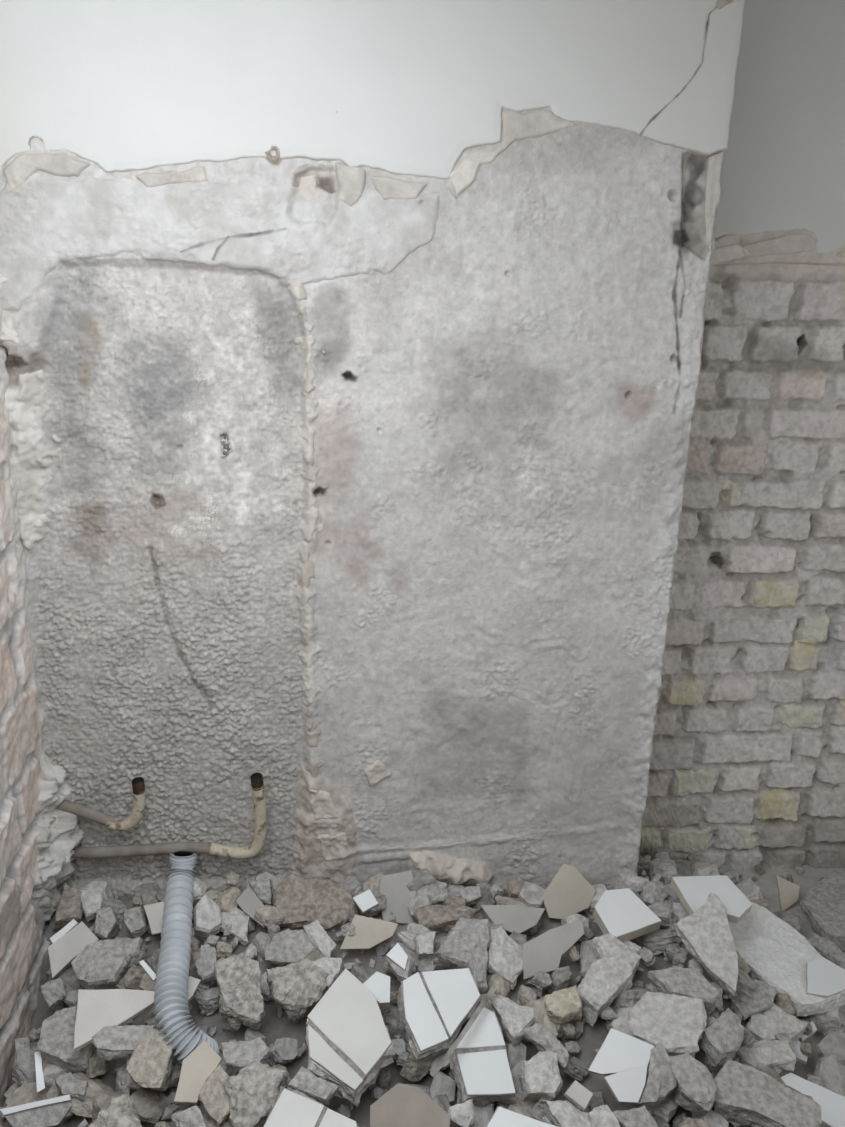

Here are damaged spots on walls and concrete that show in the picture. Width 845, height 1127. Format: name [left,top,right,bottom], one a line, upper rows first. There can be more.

crack [641,59,703,134]
spalling [0,110,577,312]
peeling [682,151,845,266]
spalling [750,577,799,607]
spalling [788,613,830,673]
spalling [662,675,705,706]
spalling [290,765,358,884]
spalling [639,826,711,853]
spalling [734,788,798,849]
spalling [340,870,416,950]
spalling [670,875,752,923]
spalling [363,971,390,1005]